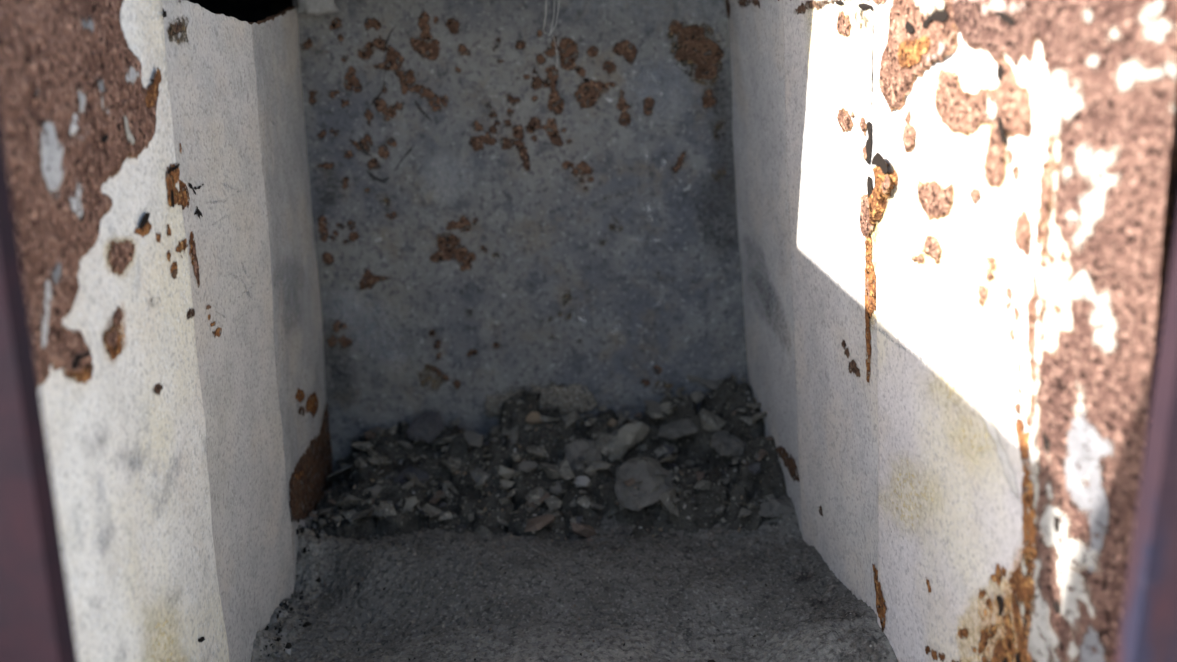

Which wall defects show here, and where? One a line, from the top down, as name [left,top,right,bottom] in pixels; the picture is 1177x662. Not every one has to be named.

corrosion [309,11,471,170]
corrosion [469,30,655,171]
corrosion [667,20,724,108]
corrosion [0,0,162,385]
corrosion [317,215,359,266]
corrosion [359,269,392,290]
corrosion [429,213,499,272]
corrosion [562,160,594,192]
corrosion [836,0,1177,662]
corrosion [289,388,333,522]